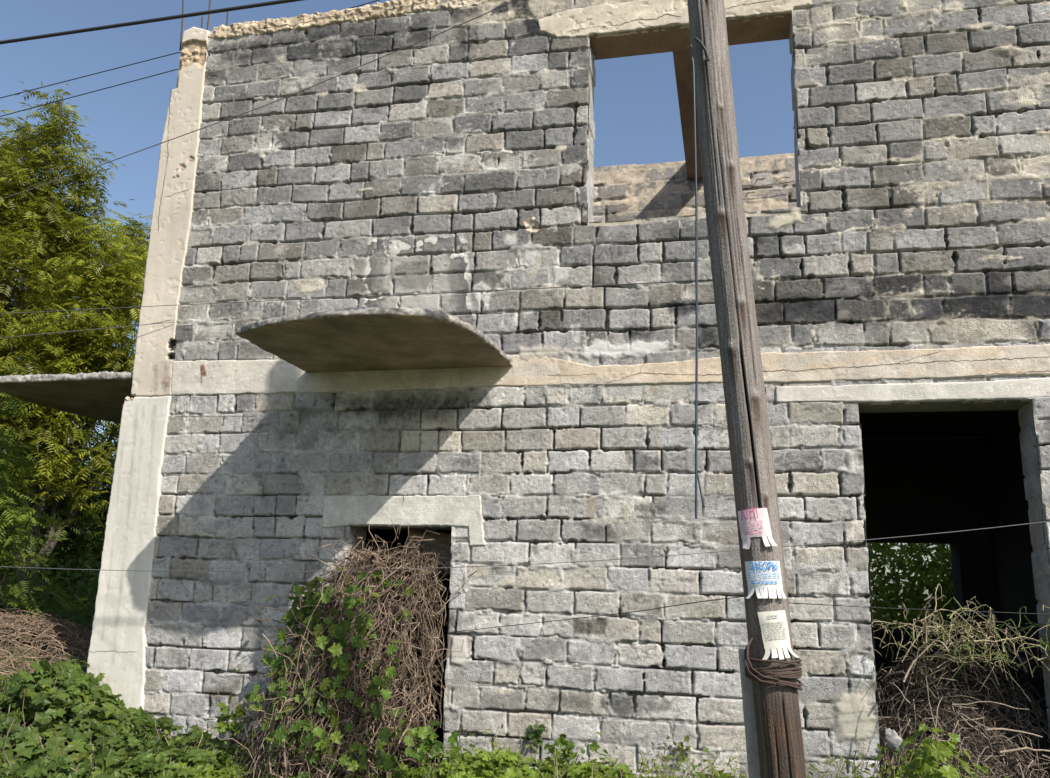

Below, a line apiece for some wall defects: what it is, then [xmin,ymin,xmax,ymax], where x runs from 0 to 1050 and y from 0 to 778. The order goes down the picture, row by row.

spalling [179,0,211,70]
water stain [504,234,538,266]
water stain [363,235,491,316]
water stain [553,263,571,284]
crack [763,352,1050,382]